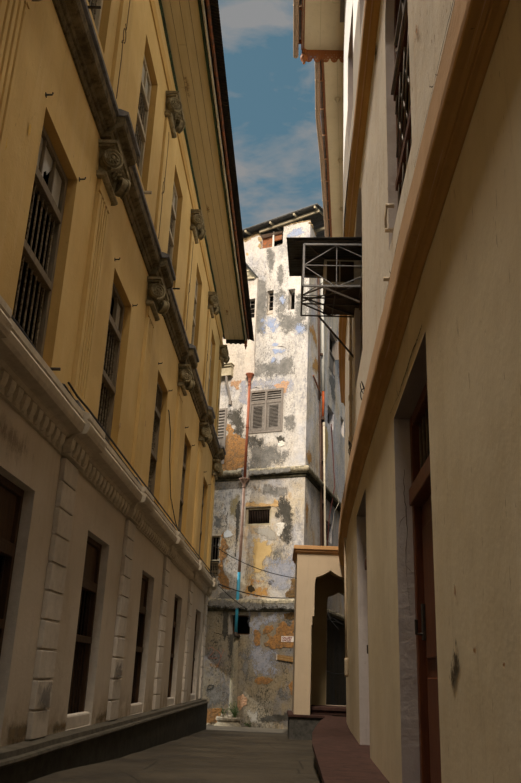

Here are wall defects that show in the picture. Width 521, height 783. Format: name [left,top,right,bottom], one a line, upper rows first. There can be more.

damp [256,249,310,335]
damp [254,357,295,380]
flaking render [222,424,245,471]
damp [254,484,293,566]
peeling [244,537,295,598]
flaking render [249,611,294,684]
flaking render [207,708,222,723]